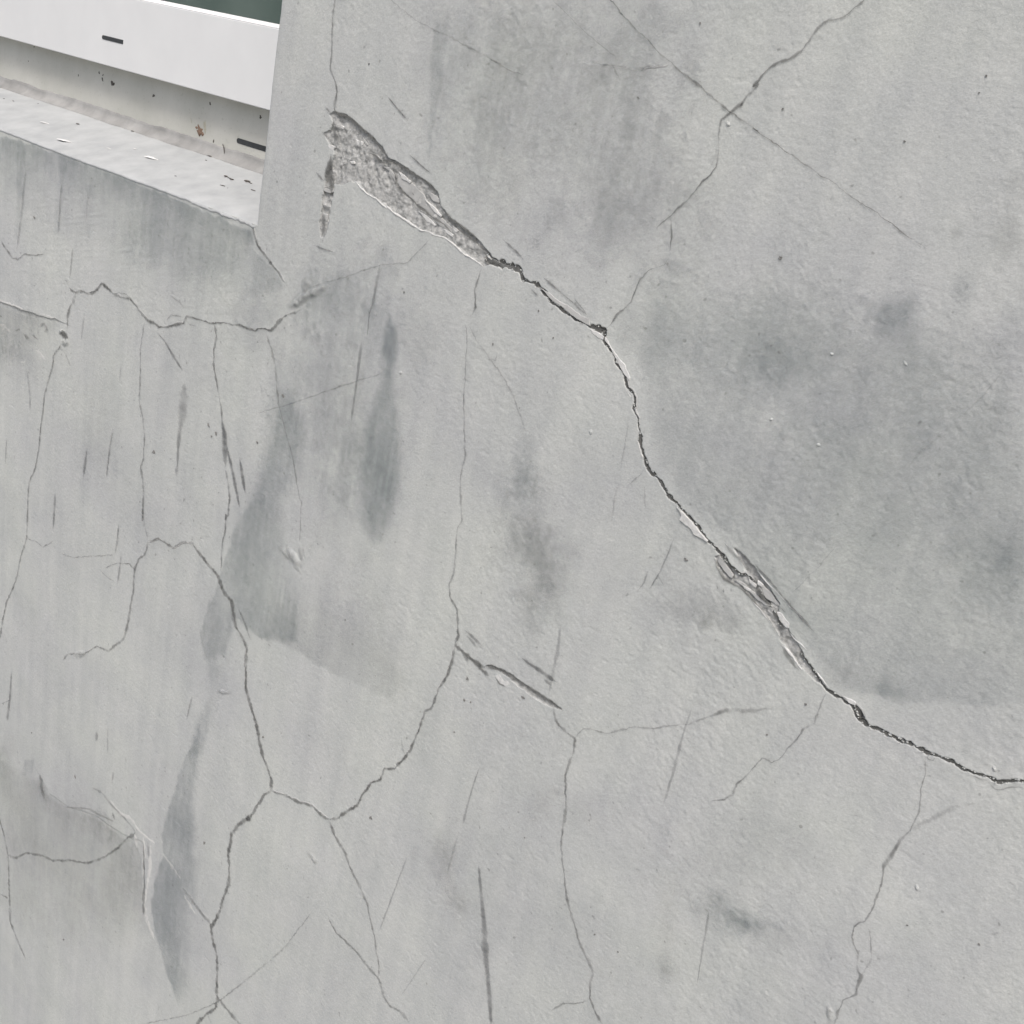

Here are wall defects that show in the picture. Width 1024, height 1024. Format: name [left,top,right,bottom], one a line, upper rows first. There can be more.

crack [643,43,701,87]
crack [722,58,790,147]
spalling [319,111,493,267]
crack [70,283,284,331]
crack [485,251,785,629]
flaking render [677,507,708,542]
spalling [715,550,827,685]
crack [144,538,455,1021]
crack [801,651,1024,784]